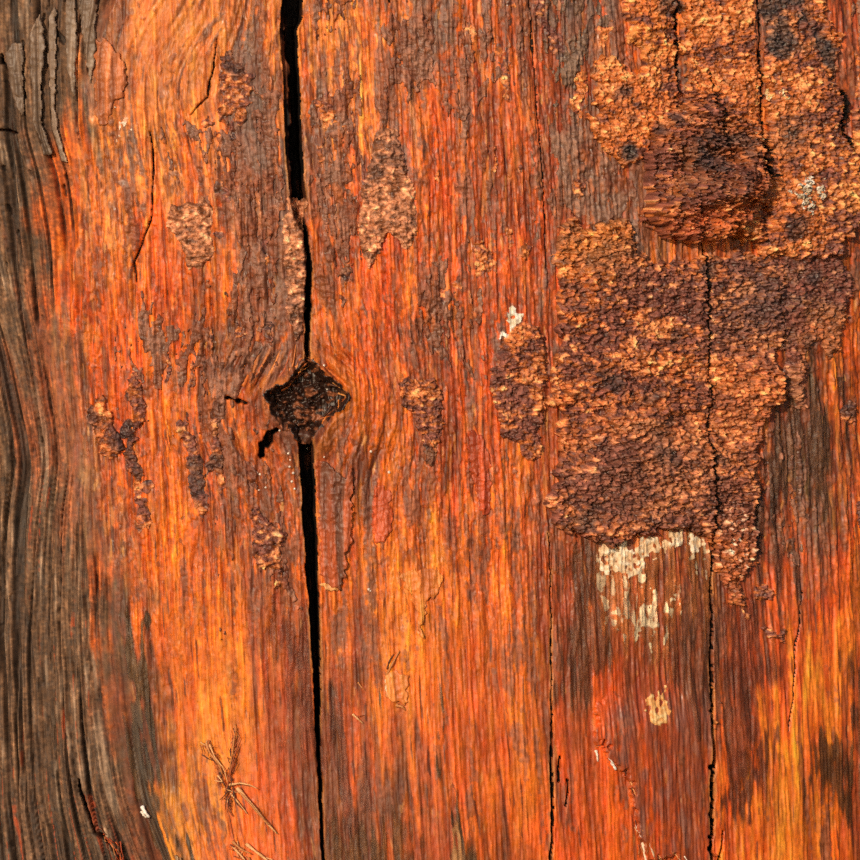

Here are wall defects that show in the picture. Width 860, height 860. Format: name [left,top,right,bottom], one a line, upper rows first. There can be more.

crack [280,0,312,356]
crack [528,0,546,268]
crack [672,0,680,99]
crack [709,72,732,148]
crack [756,0,784,179]
crack [258,428,279,458]
crack [298,443,325,860]
crack [548,536,569,860]
damp [550,529,711,708]
crack [702,250,724,859]